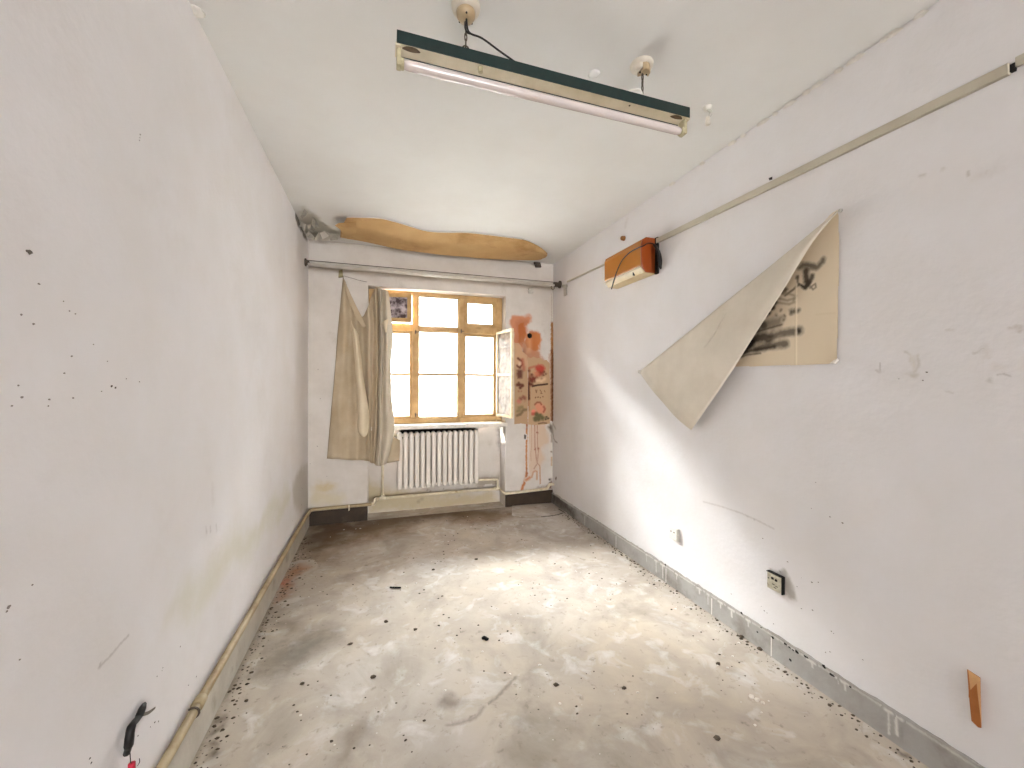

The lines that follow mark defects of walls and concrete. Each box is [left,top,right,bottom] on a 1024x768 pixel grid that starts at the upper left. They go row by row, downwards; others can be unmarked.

peeling [294,204,547,260]